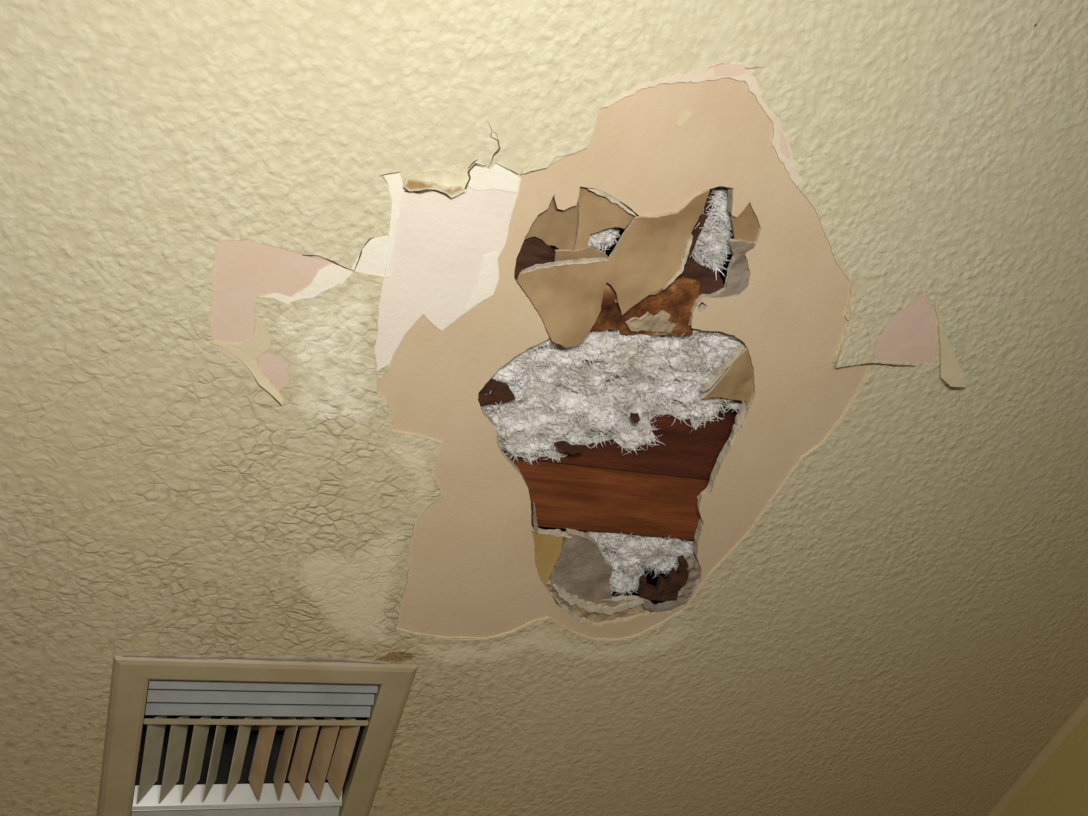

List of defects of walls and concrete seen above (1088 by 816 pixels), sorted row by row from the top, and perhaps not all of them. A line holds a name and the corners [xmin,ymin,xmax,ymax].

peeling [209,61,875,668]